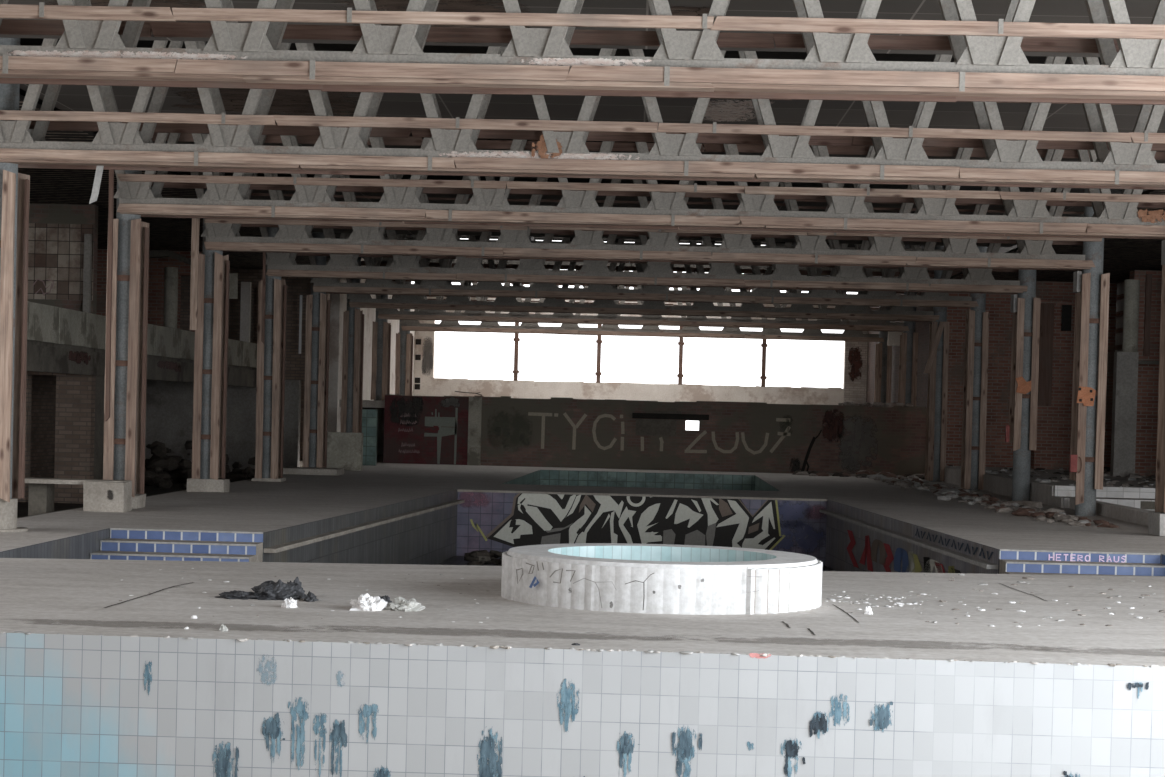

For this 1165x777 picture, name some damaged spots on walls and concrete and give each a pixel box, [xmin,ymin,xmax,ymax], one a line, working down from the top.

peeling [288,697,327,777]
peeling [557,679,579,732]